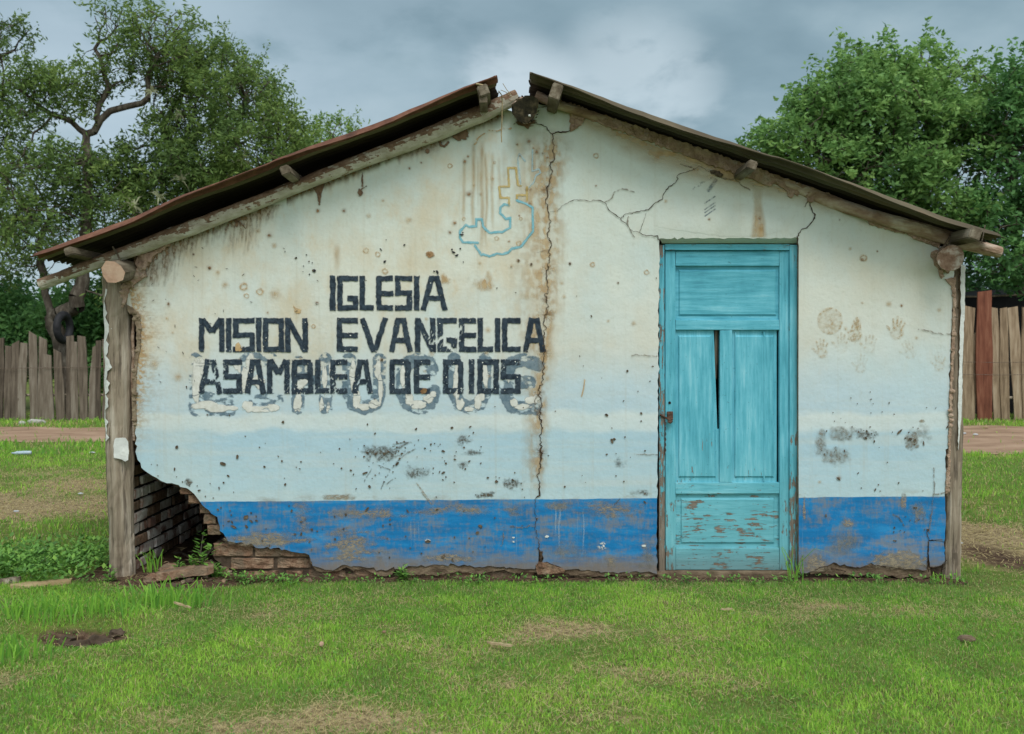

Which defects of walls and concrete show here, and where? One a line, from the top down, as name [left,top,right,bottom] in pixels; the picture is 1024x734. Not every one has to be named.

crack [474,106,750,552]
peeling [191,337,284,423]
peeling [287,373,308,412]
peeling [319,350,436,412]
flaking render [174,455,657,578]